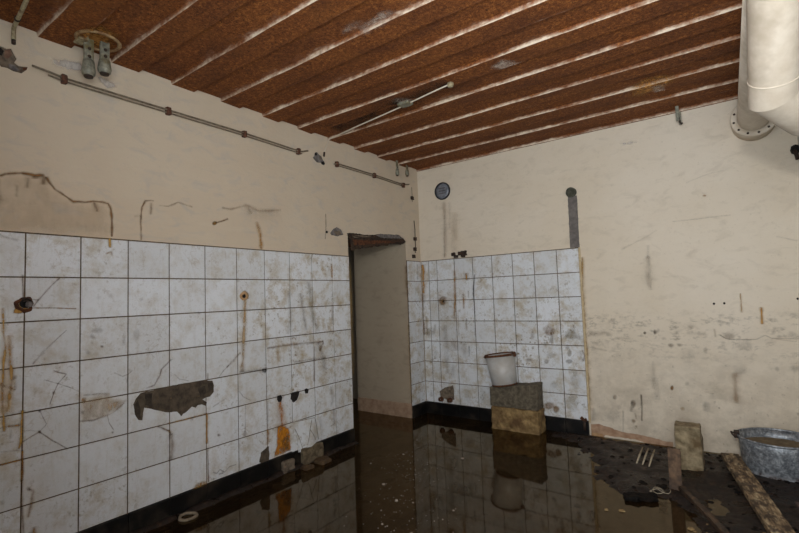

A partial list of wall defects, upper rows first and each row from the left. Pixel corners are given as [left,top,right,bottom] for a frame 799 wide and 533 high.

flaking render [0,47,28,73]
leakage [0,172,113,236]
corrosion [1,346,24,481]
spalling [133,380,214,420]
spalling [259,446,270,463]
corrosion [267,402,291,455]